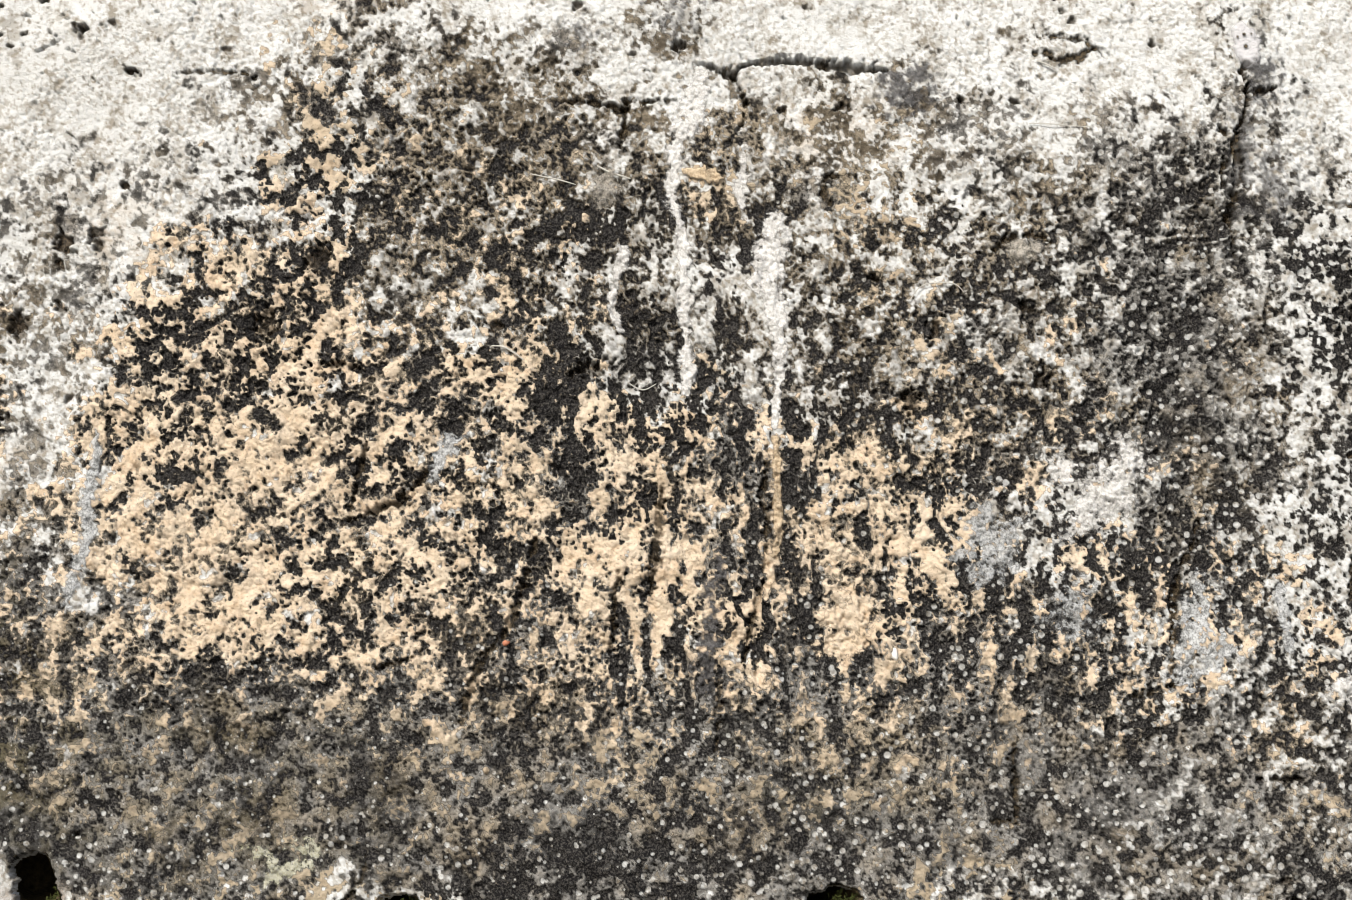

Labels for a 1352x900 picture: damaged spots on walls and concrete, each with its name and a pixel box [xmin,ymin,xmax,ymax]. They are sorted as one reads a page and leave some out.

water stain [330,0,420,40]
water stain [610,0,716,88]
crack [695,1,885,108]
water stain [1141,95,1166,119]
crack [1218,64,1274,256]
water stain [1304,150,1352,198]
water stain [0,158,184,246]
water stain [222,427,245,450]
water stain [89,471,136,547]
water stain [117,548,155,583]
water stain [189,594,226,620]
water stain [286,613,309,635]